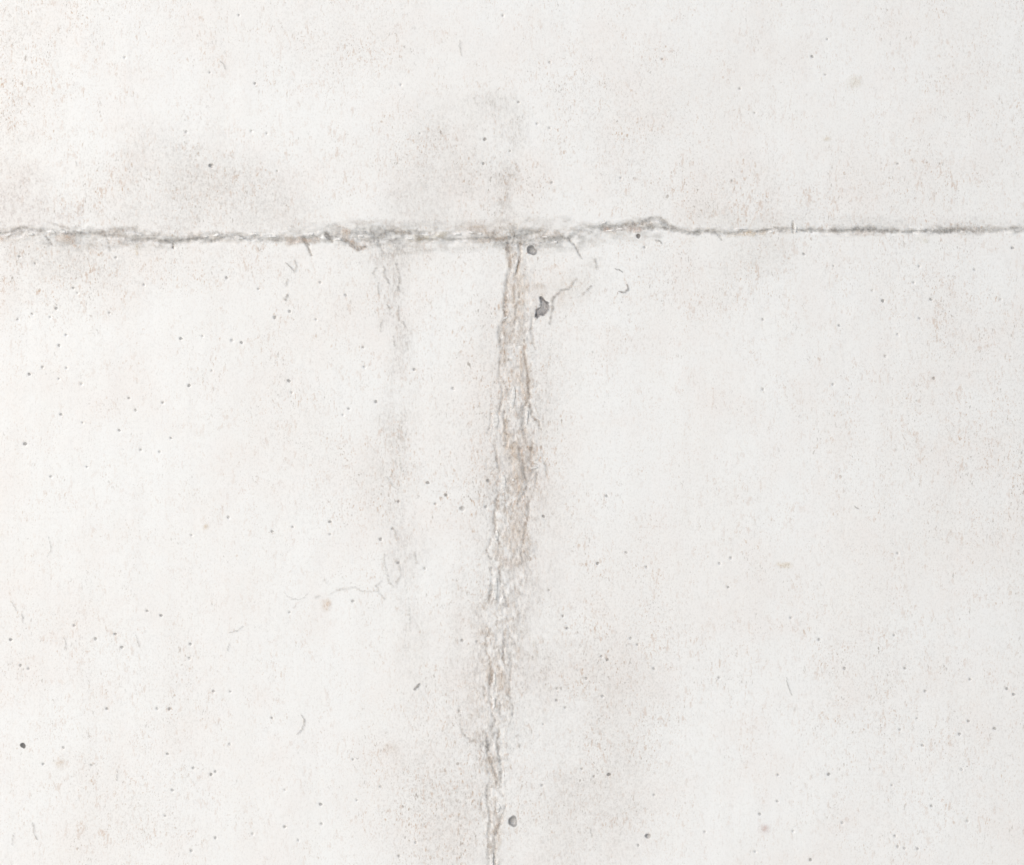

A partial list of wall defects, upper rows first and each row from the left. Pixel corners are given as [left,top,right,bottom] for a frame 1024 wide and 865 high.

crack [304,231,430,250]